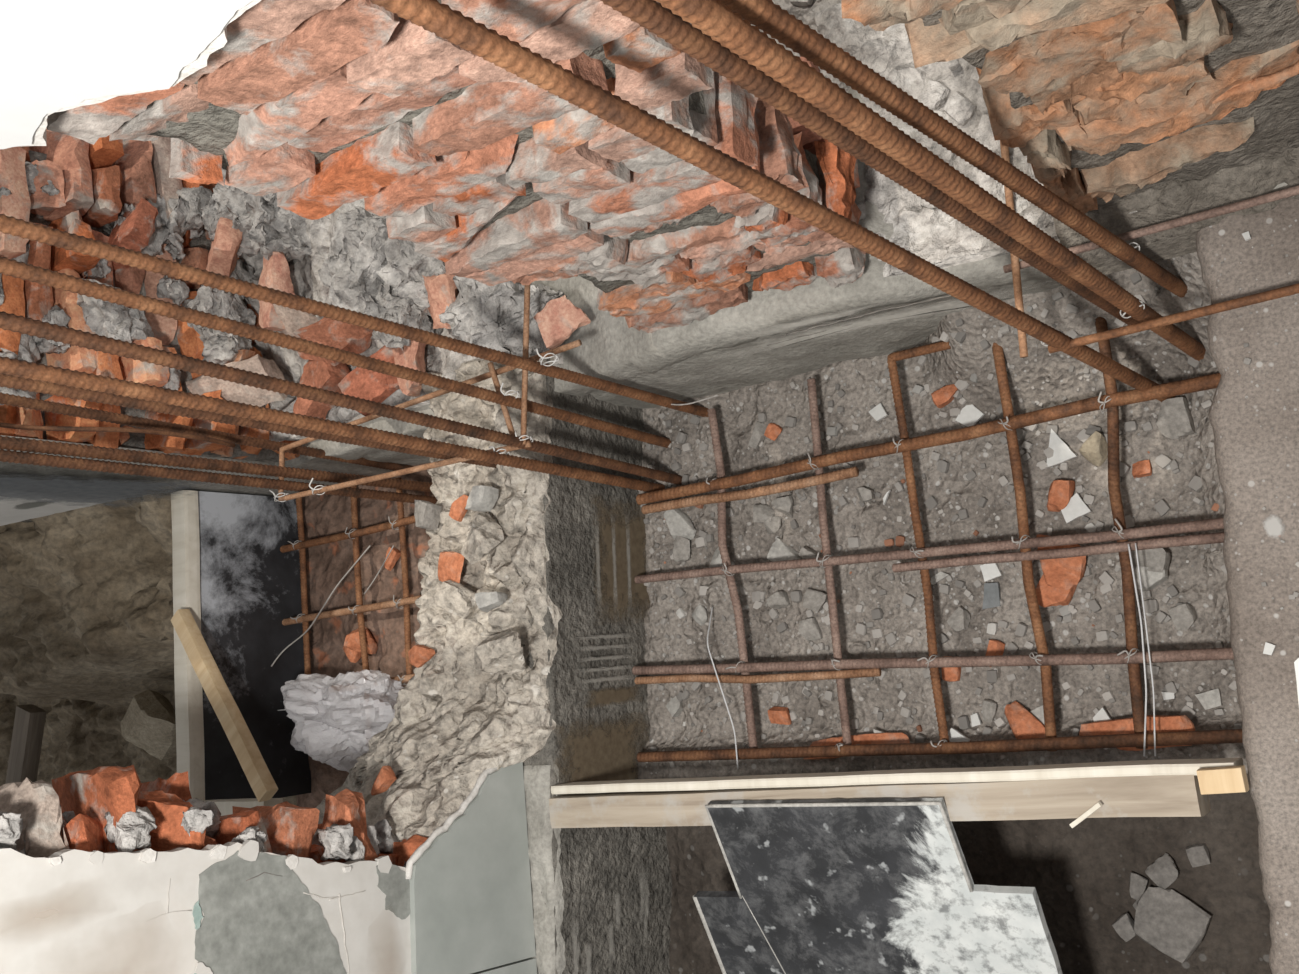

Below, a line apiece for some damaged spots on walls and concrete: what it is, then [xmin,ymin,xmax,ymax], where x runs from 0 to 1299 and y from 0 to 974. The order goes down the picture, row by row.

spalling [0,0,1299,552]
spalling [0,311,1243,798]
spalling [0,765,497,974]
spalling [541,826,672,974]